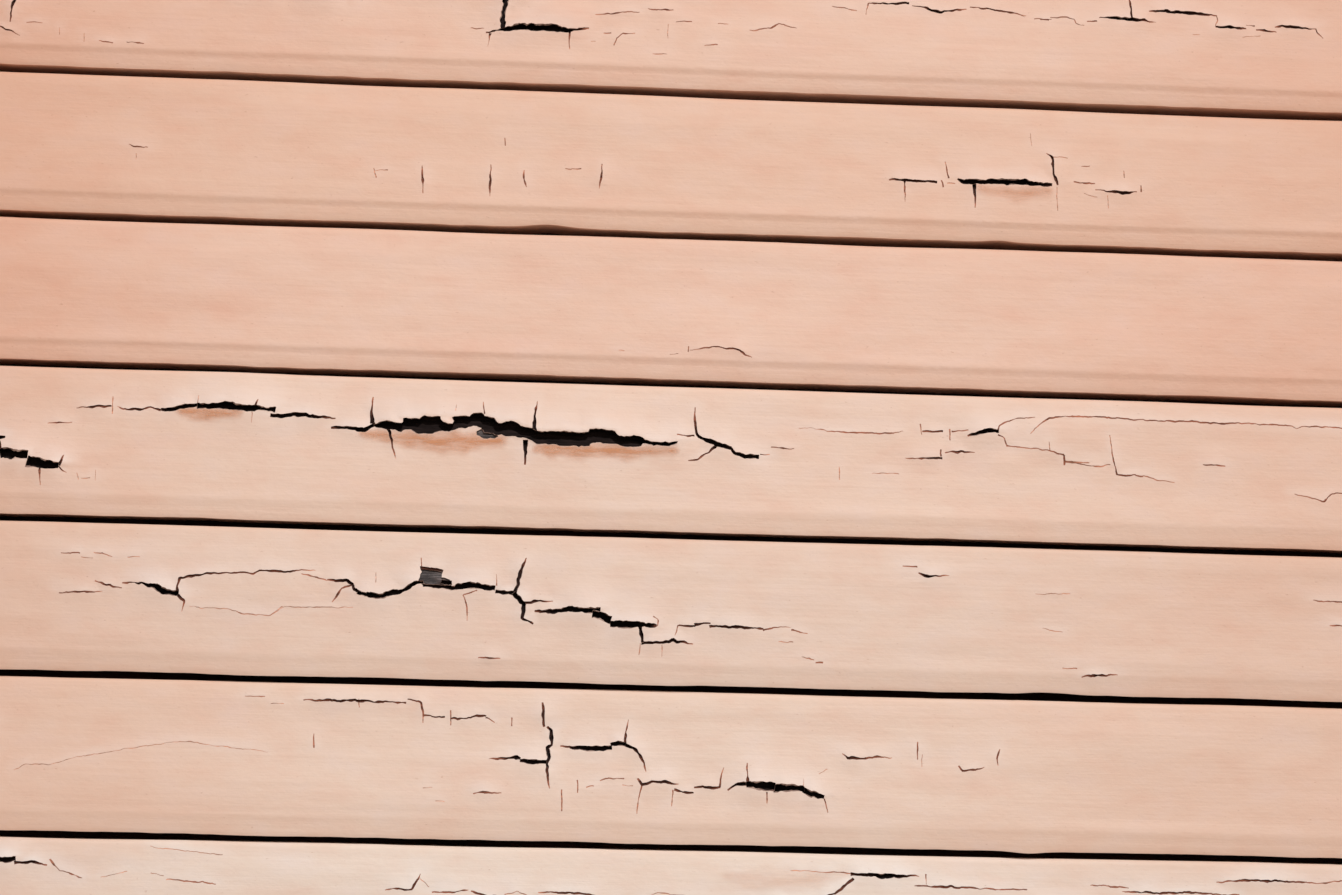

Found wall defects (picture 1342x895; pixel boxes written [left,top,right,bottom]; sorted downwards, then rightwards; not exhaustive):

peeling [471,0,589,49]
crack [832,0,1323,38]
crack [889,133,1142,211]
crack [49,395,975,474]
crack [0,435,96,485]
crack [59,552,185,612]
crack [327,558,823,664]
crack [246,696,923,814]
peeling [0,856,55,866]
crack [386,874,592,895]
crack [915,883,1027,891]
crack [1090,879,1342,895]